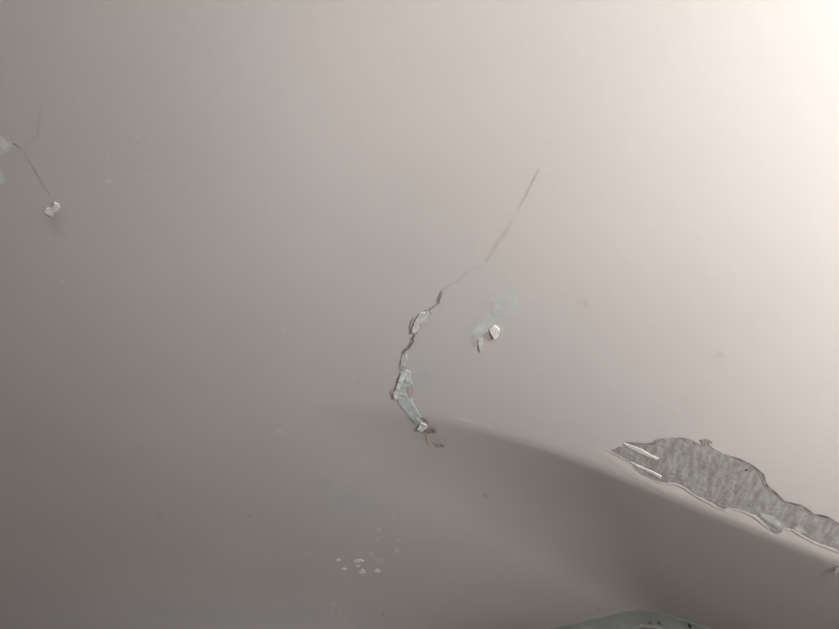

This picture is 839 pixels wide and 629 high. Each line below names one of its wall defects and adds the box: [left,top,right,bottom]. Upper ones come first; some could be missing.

crack [391,168,540,448]
peeling [470,322,500,351]
peeling [592,437,839,574]